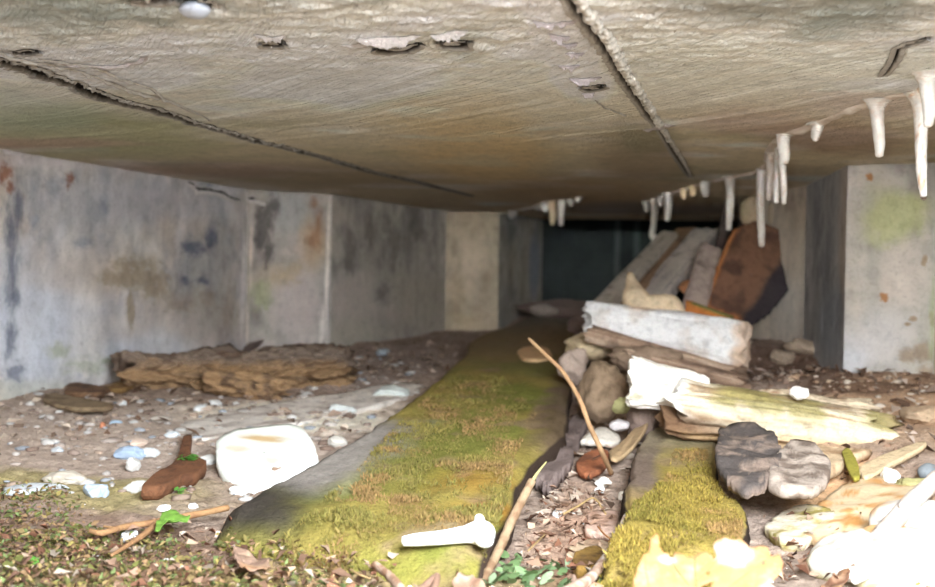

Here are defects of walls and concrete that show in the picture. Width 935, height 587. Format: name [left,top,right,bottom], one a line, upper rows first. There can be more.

crack [188,181,266,206]
crack [0,52,475,197]
peeling [341,30,474,56]
peeling [532,20,626,116]
crack [559,0,692,177]
water stain [711,103,868,183]
water stain [0,156,79,396]
water stain [67,187,434,350]